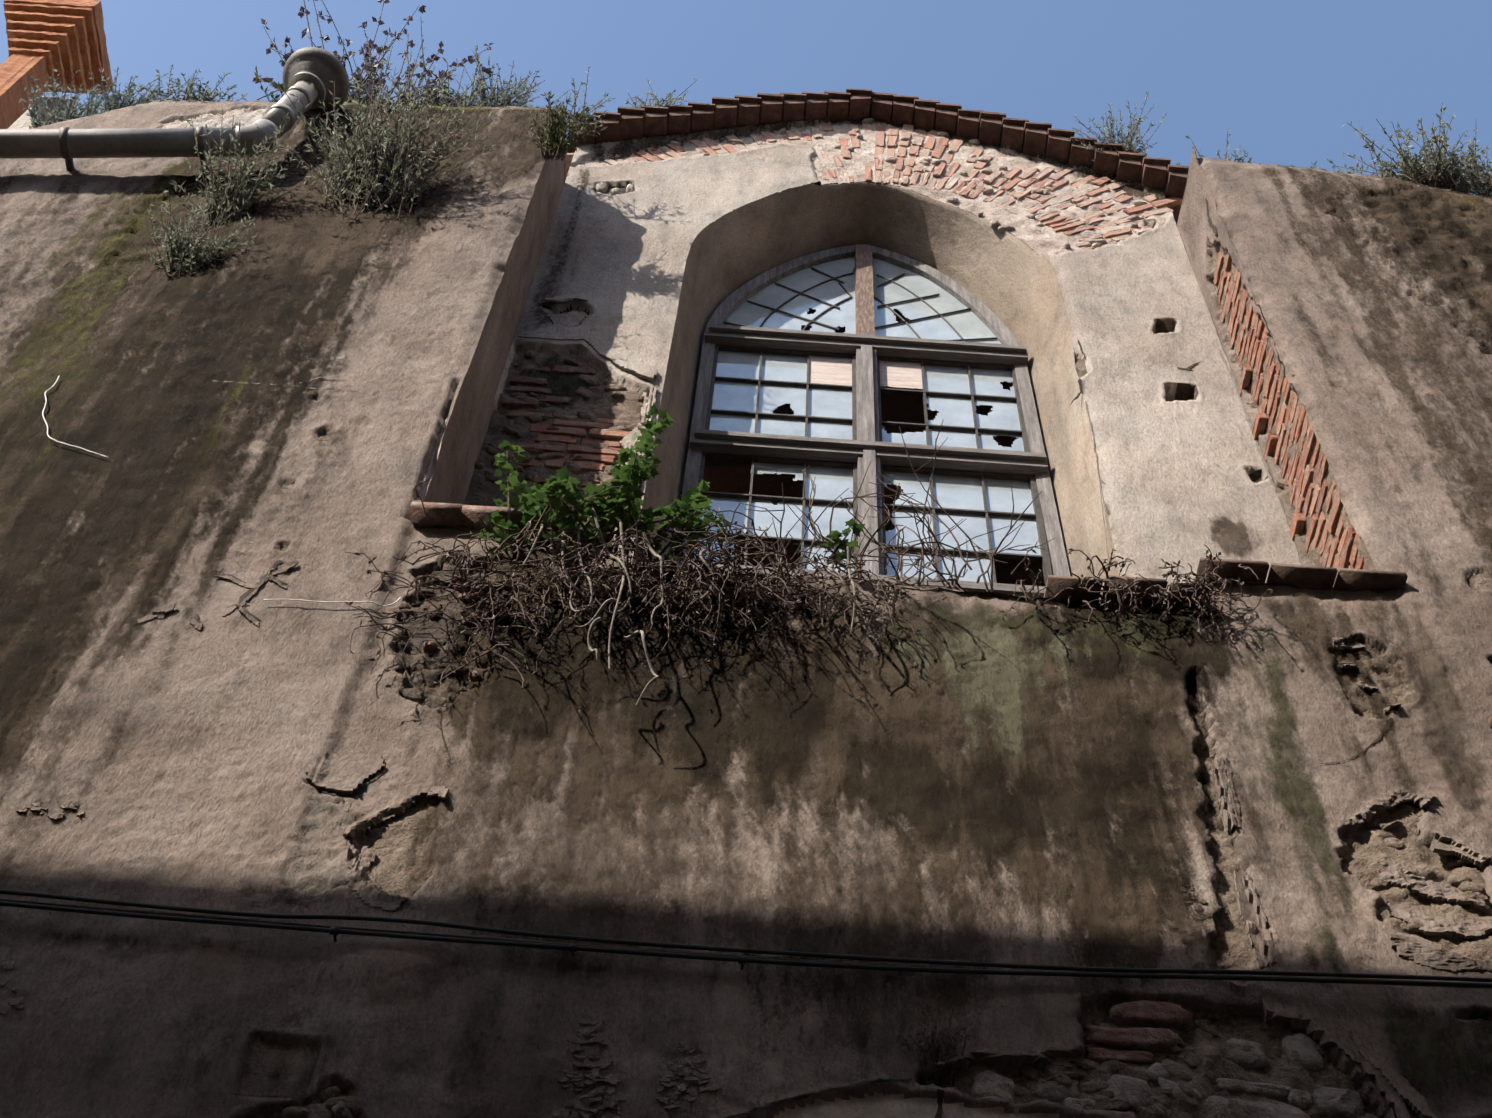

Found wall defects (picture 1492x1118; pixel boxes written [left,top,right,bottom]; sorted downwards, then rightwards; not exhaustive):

damp [525,169,588,329]
spalling [576,118,1183,255]
damp [1302,177,1492,341]
damp [0,104,555,799]
spalling [462,293,658,510]
spalling [1329,634,1416,719]
flaking render [283,747,449,912]
damp [407,542,1235,1053]
spalling [922,677,1437,1118]
damp [1227,762,1267,854]
spalling [1338,786,1492,972]
crack [725,1078,944,1118]